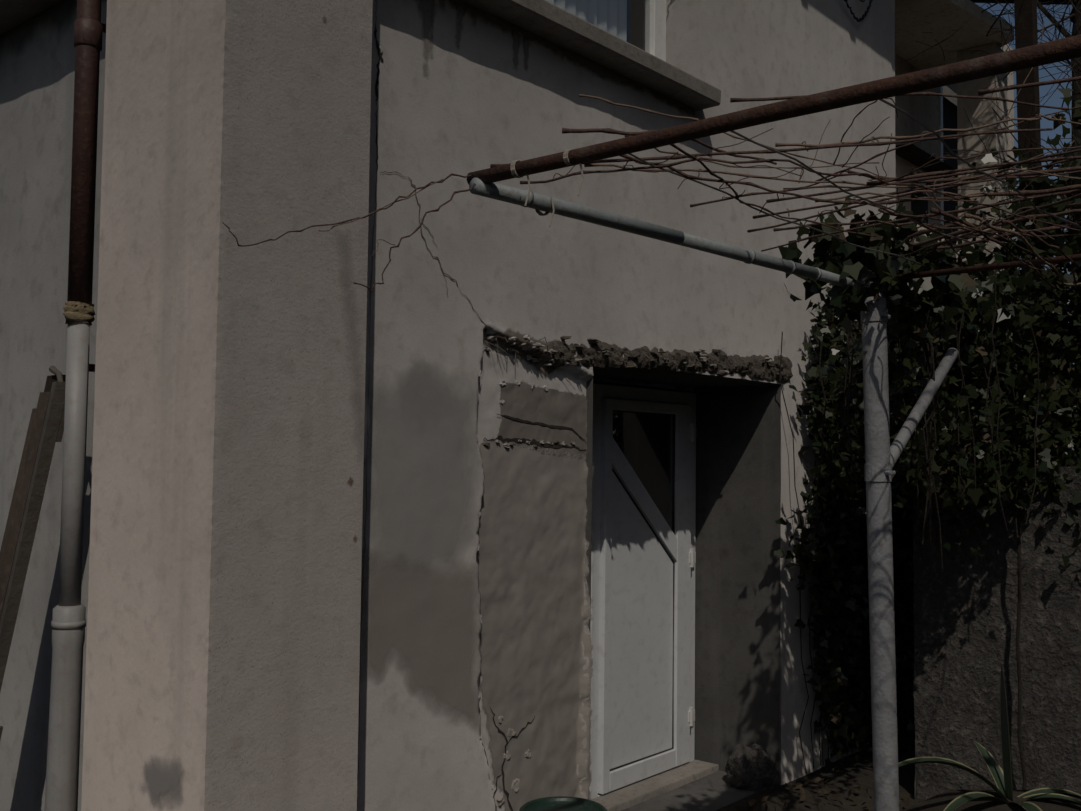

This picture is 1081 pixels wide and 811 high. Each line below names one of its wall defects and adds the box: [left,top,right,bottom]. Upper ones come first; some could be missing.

crack [370,0,490,335]
water stain [419,0,694,115]
spalling [476,328,793,811]
crack [490,707,535,811]